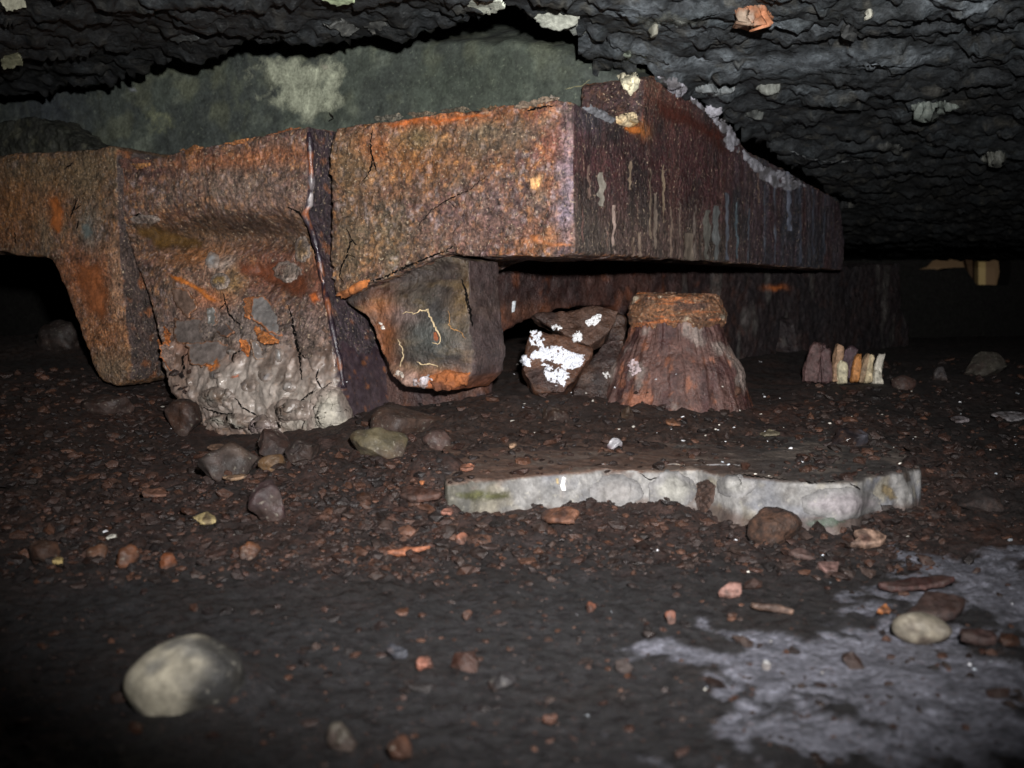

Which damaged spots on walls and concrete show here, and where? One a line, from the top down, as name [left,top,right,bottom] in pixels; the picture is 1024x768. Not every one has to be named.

rust [393,115,486,126]
crack [362,128,377,181]
rust [239,263,318,302]
rust [336,279,370,299]
crack [288,207,473,326]
crack [220,294,243,363]
crack [287,304,332,429]
rust [429,370,470,392]
crack [203,398,256,415]